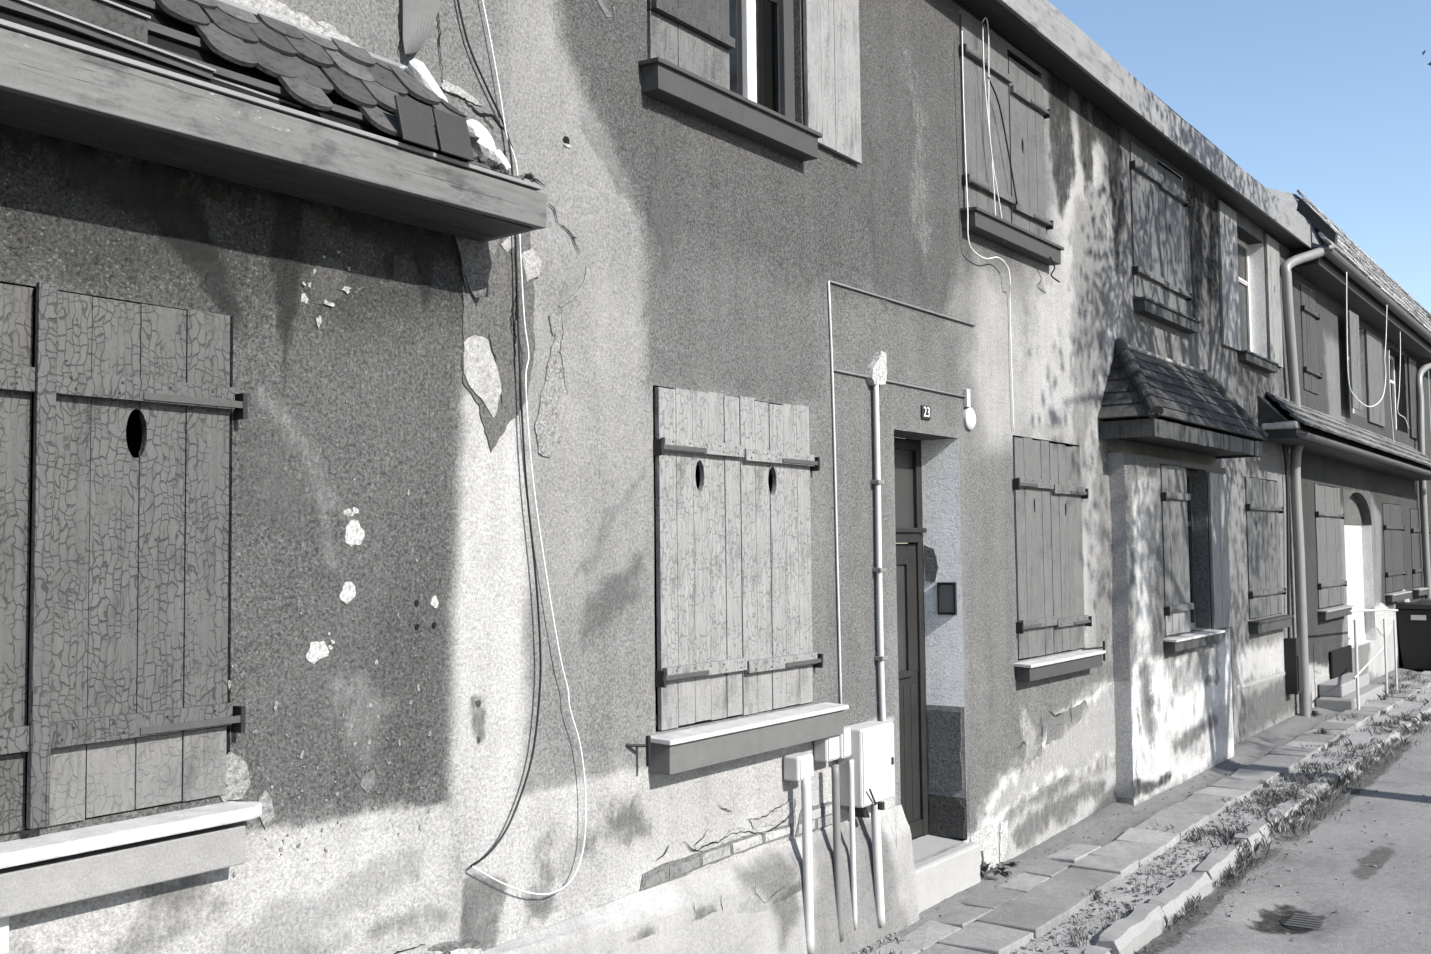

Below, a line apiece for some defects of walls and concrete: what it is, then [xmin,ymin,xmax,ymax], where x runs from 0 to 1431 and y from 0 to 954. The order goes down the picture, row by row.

water stain [1187,184,1218,319]
flaking render [455,231,567,457]
water stain [991,70,1125,814]
water stain [1143,643,1220,741]
water stain [1175,716,1217,750]
flaking render [639,800,833,892]
water stain [1014,772,1171,847]
flaking render [427,939,484,954]